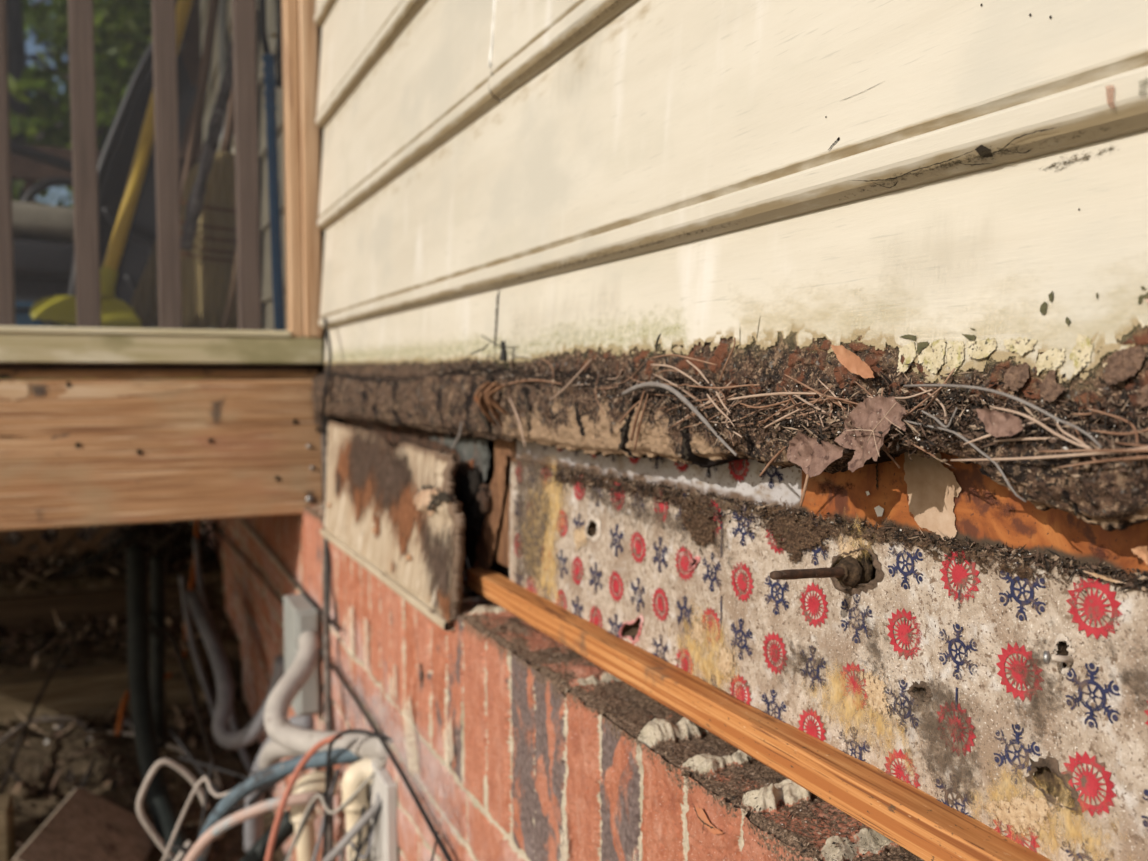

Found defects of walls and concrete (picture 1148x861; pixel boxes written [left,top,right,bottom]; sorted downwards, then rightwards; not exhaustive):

peeling [1040,291,1053,314]
peeling [897,317,1094,402]
spalling [1103,345,1148,407]
leakage [332,421,456,624]
leakage [559,813,569,861]